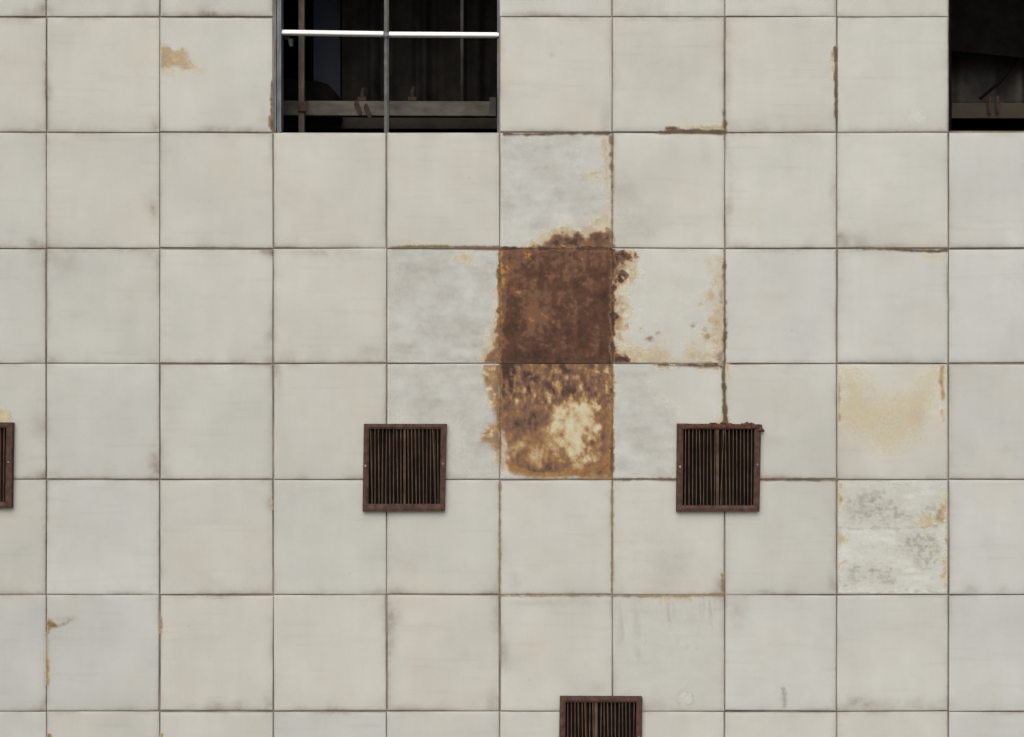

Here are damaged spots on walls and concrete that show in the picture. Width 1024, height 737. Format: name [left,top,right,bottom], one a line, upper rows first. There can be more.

corrosion [655,111,727,136]
corrosion [503,131,614,188]
corrosion [392,210,762,597]